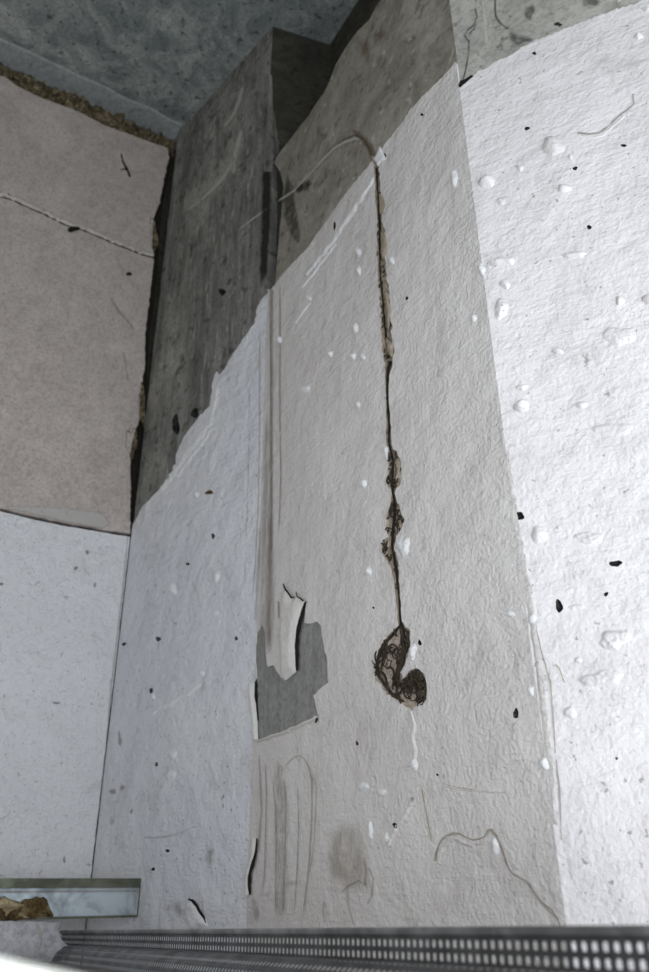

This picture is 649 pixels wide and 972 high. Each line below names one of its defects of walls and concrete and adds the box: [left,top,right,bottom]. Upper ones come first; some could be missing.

crack [126,153,173,534]
peeling [374,147,385,166]
crack [371,156,402,626]
peeling [248,584,328,743]